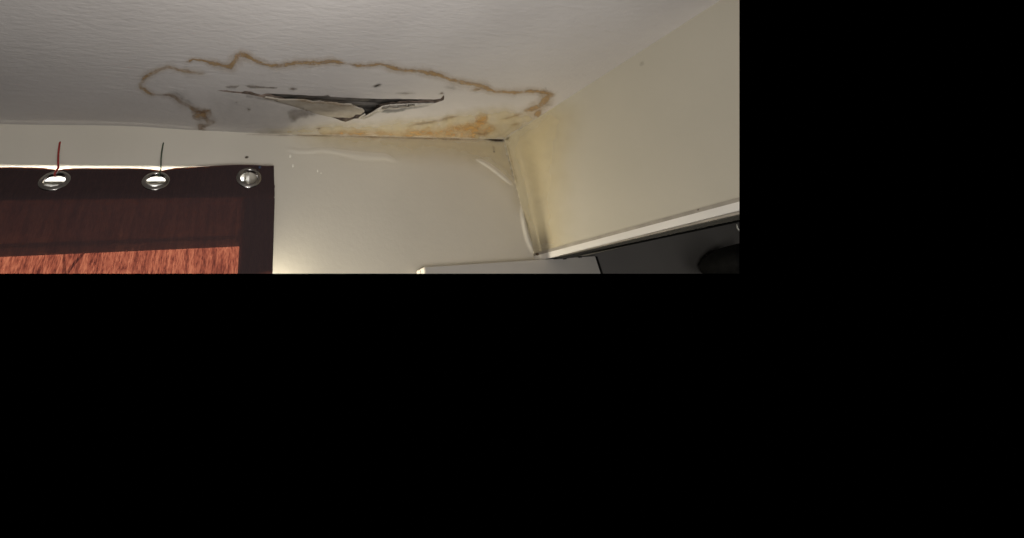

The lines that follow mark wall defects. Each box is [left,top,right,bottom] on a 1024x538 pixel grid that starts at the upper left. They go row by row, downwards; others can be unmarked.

peeling [248,84,443,119]
water stain [178,53,551,138]